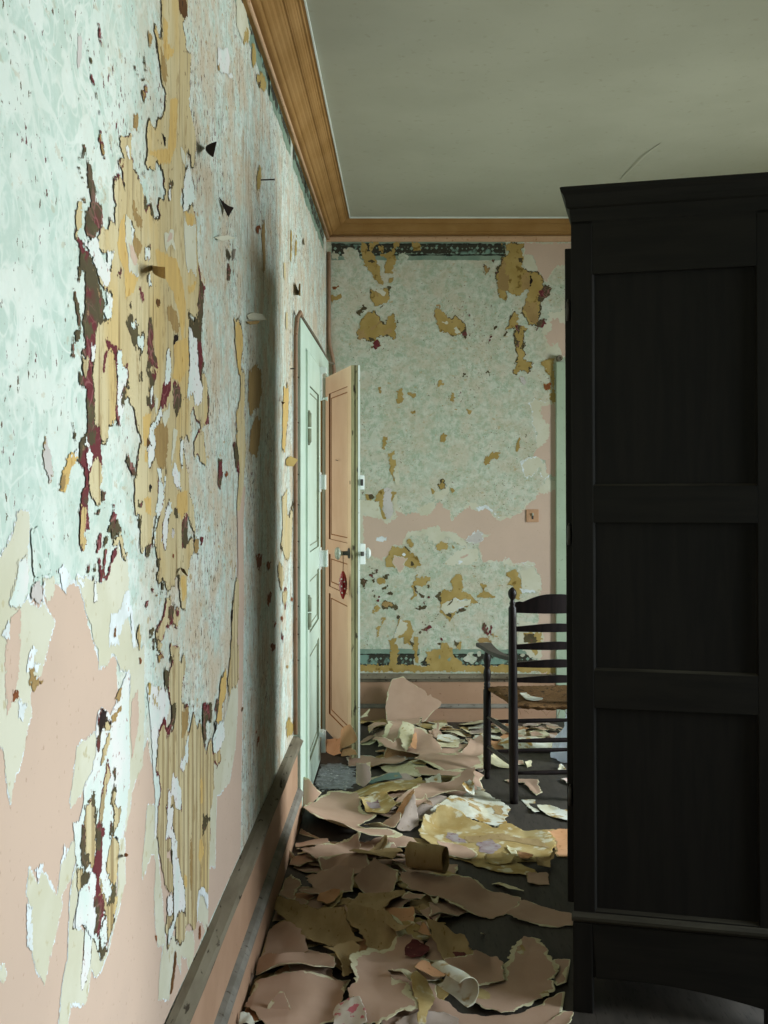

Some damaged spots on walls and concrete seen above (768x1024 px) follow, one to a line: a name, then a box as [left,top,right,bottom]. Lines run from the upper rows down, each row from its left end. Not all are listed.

peeling [0,0,293,1024]
peeling [356,242,571,674]